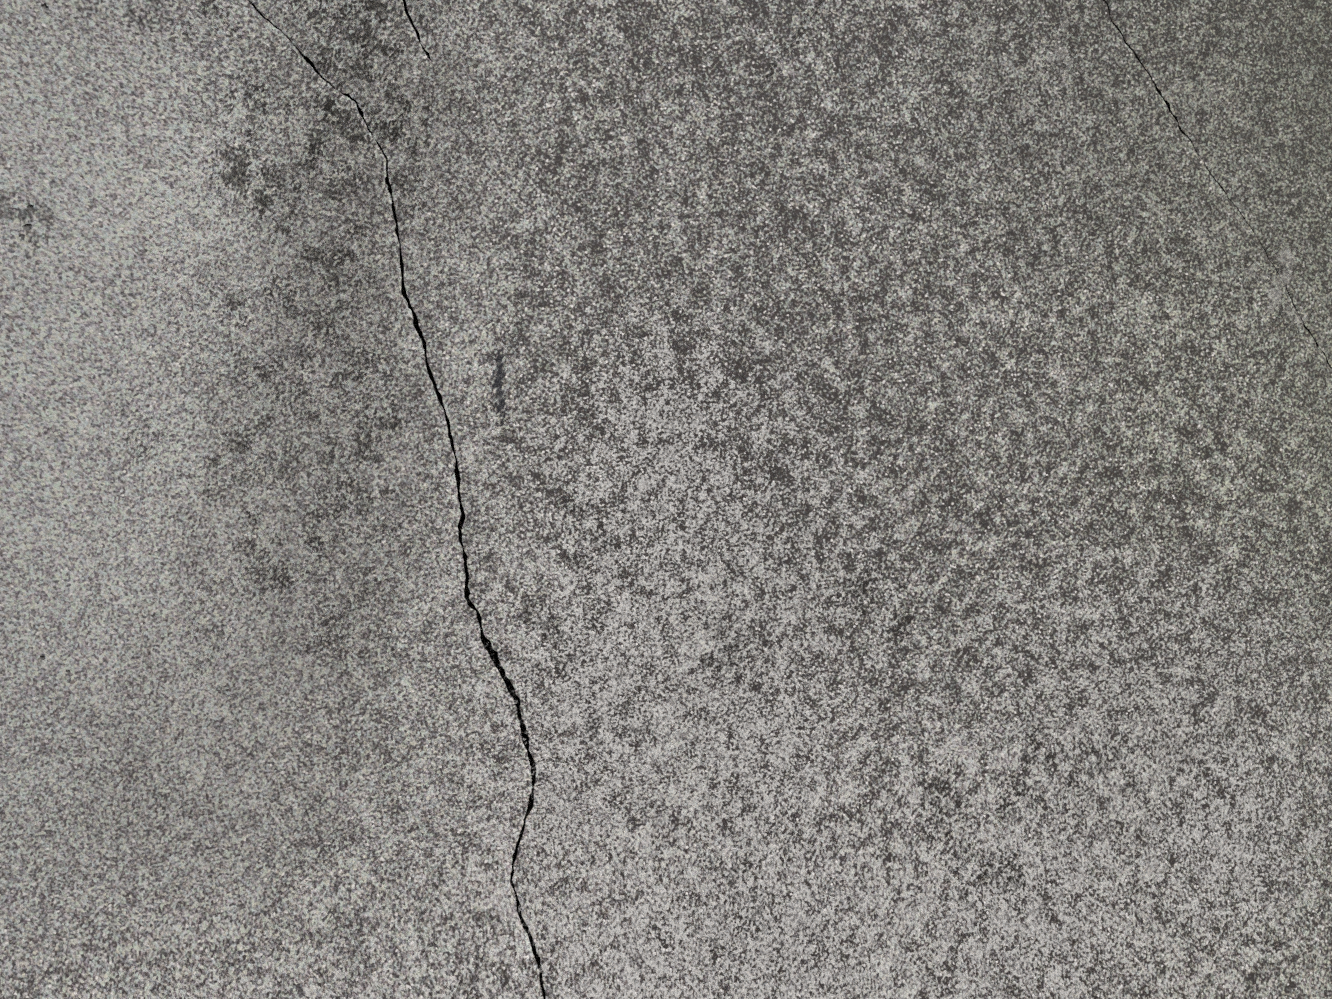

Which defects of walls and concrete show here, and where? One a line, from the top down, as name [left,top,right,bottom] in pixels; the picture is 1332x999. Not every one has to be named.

crack [248,0,546,999]